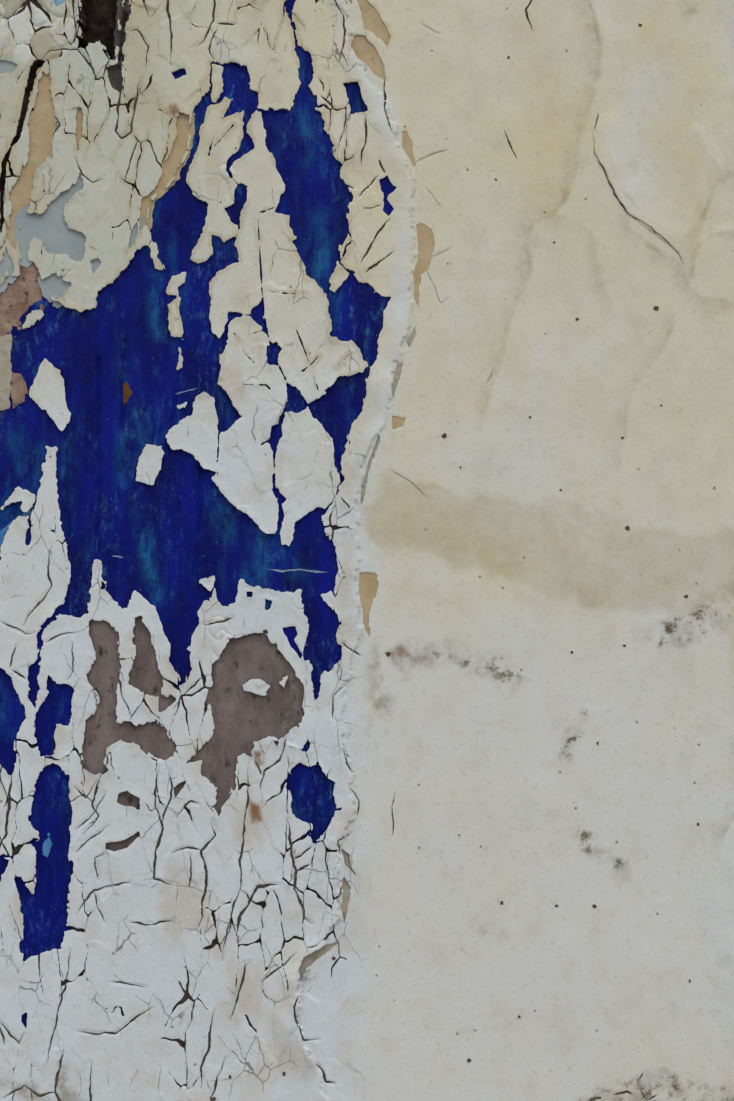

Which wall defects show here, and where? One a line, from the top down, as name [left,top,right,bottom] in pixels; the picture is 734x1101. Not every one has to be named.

crack [0,0,235,233]
peeling [379,176,396,216]
peeling [402,126,416,167]
peeling [0,0,391,961]
peeling [391,362,403,397]
peeling [392,416,405,430]
crack [0,774,12,847]
crack [76,774,216,931]
crack [223,739,312,948]
crack [5,950,149,1101]
crack [200,956,292,1101]
peeling [298,937,340,981]